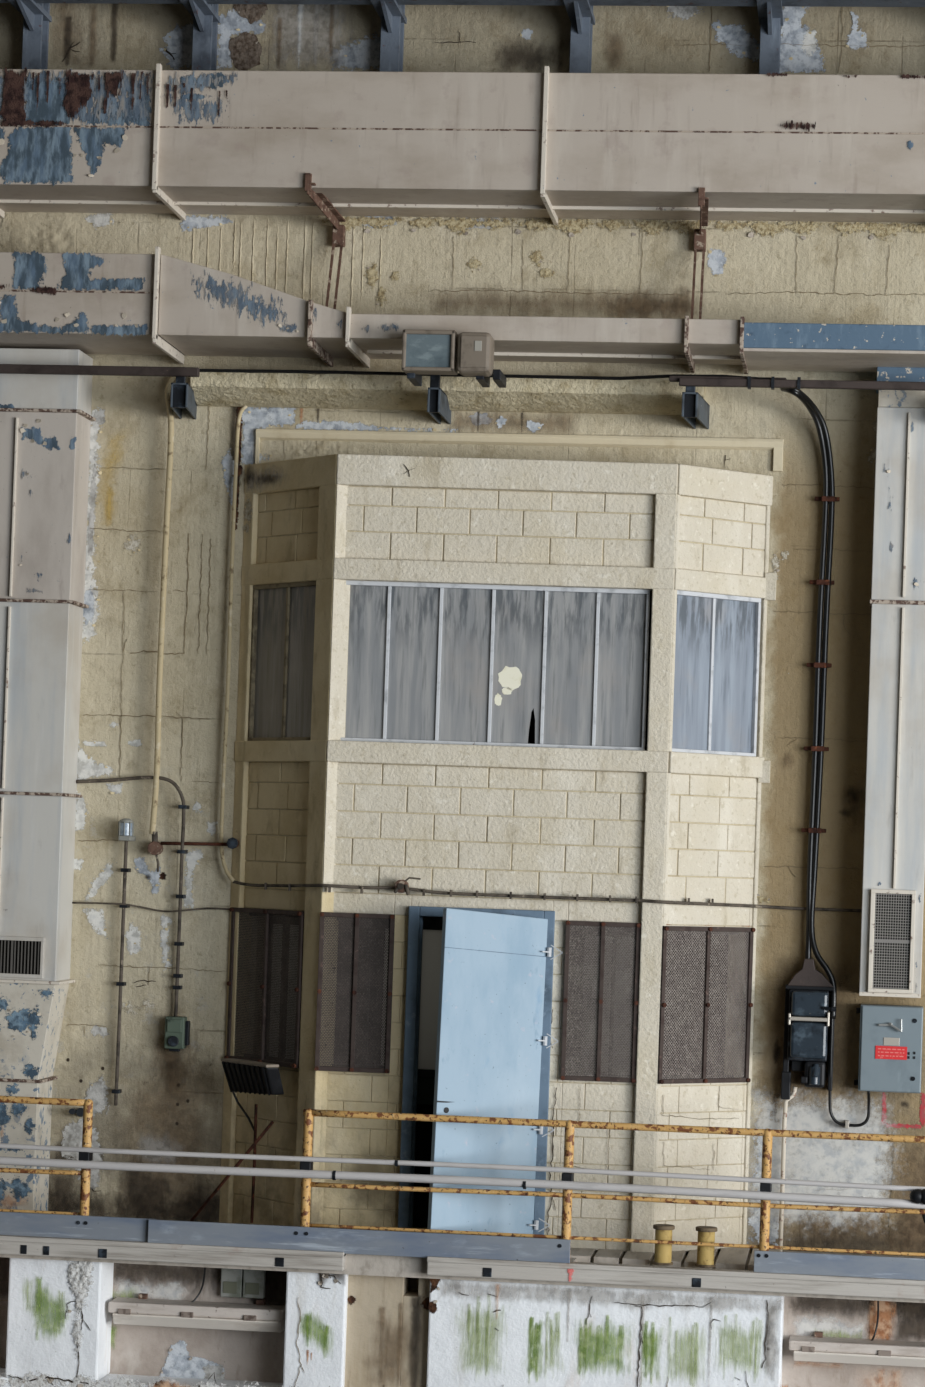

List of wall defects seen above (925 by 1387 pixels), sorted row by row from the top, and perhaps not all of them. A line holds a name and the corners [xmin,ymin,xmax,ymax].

peeling [780,6,826,74]
corrosion [0,68,150,127]
peeling [0,4,268,186]
corrosion [166,83,228,123]
peeling [0,250,148,337]
peeling [0,1063,40,1151]
crack [8,1261,94,1386]
peeling [0,1261,259,1387]
crack [295,1273,341,1383]
water stain [497,1286,693,1327]
crack [586,1298,719,1387]
corrosion [869,1300,896,1340]